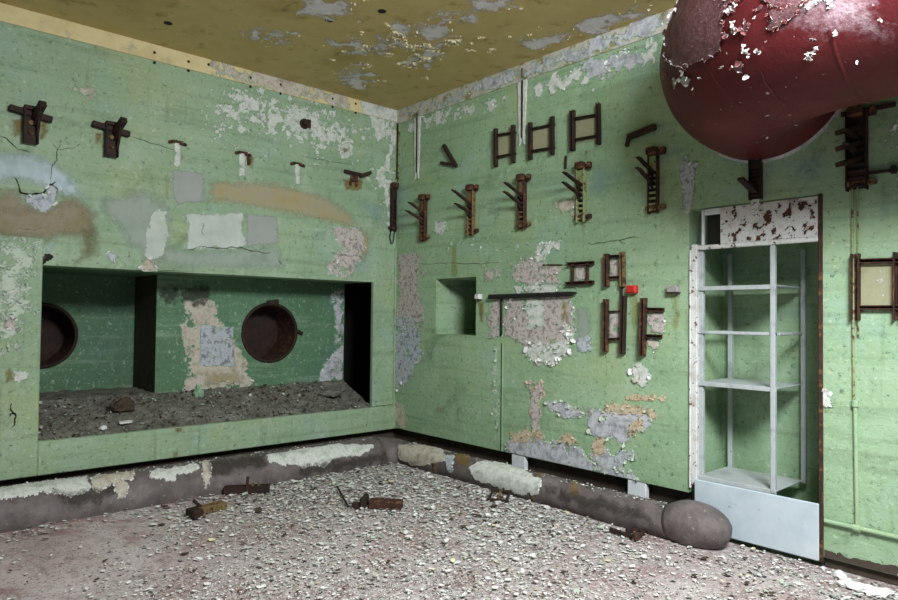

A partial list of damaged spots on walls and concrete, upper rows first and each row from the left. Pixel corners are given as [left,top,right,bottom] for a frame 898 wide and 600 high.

crack [15,141,76,200]
peeling [188,0,834,232]
peeling [0,235,51,358]
peeling [179,298,254,391]
spalling [318,225,367,381]
peeling [394,247,425,429]
peeling [434,220,667,496]
peeling [0,470,136,500]
peeling [149,460,213,489]